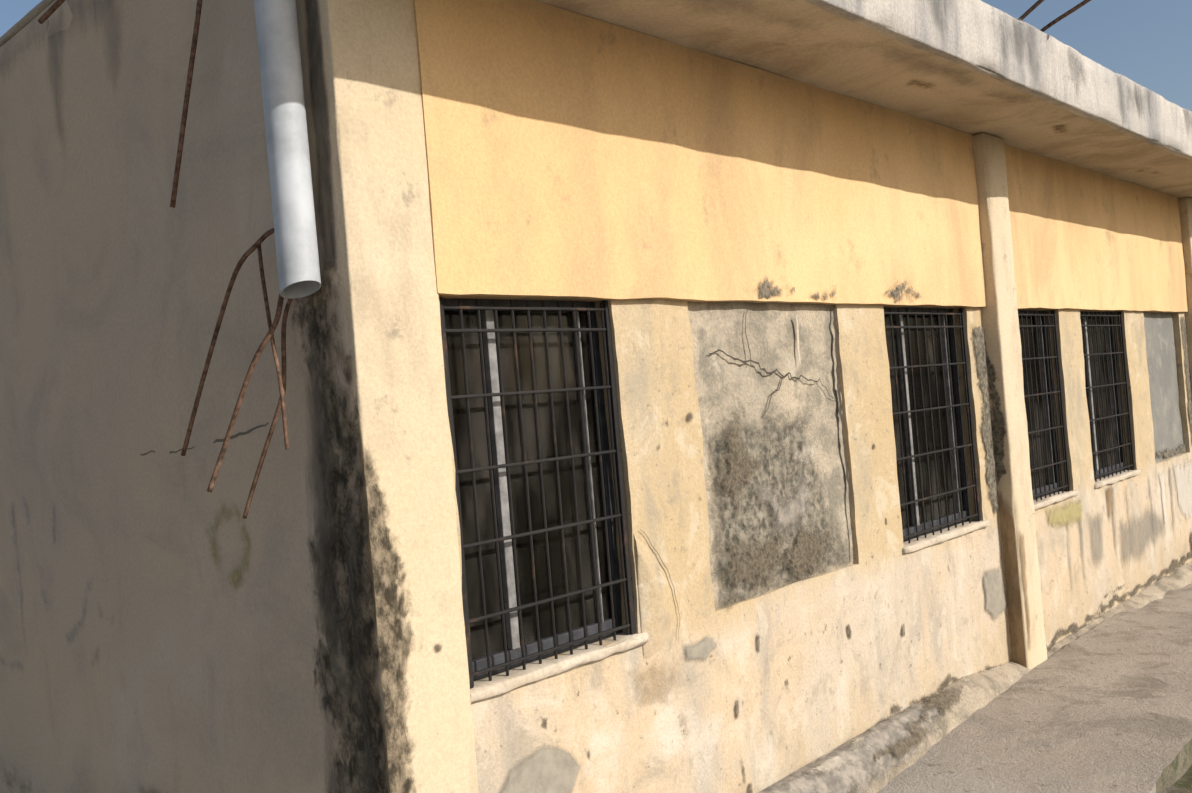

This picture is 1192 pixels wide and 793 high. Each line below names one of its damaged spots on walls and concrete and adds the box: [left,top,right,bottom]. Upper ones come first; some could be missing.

damp [293,0,416,793]
spalling [710,409,848,607]
crack [709,305,856,559]
peeling [501,747,590,793]
spalling [742,686,963,793]